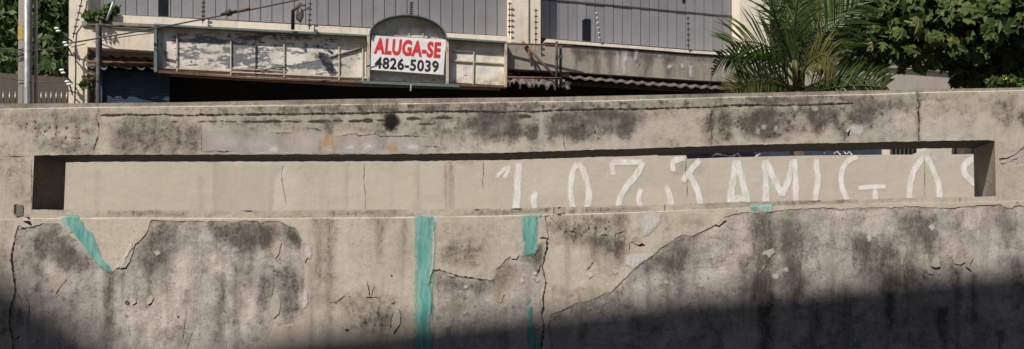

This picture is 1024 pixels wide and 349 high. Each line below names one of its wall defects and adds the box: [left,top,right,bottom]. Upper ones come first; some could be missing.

water stain [189,102,398,271]
water stain [406,101,641,145]
peeling [10,204,308,349]
crack [537,213,576,349]
peeling [429,201,1024,349]
water stain [726,218,814,349]
water stain [852,234,925,323]